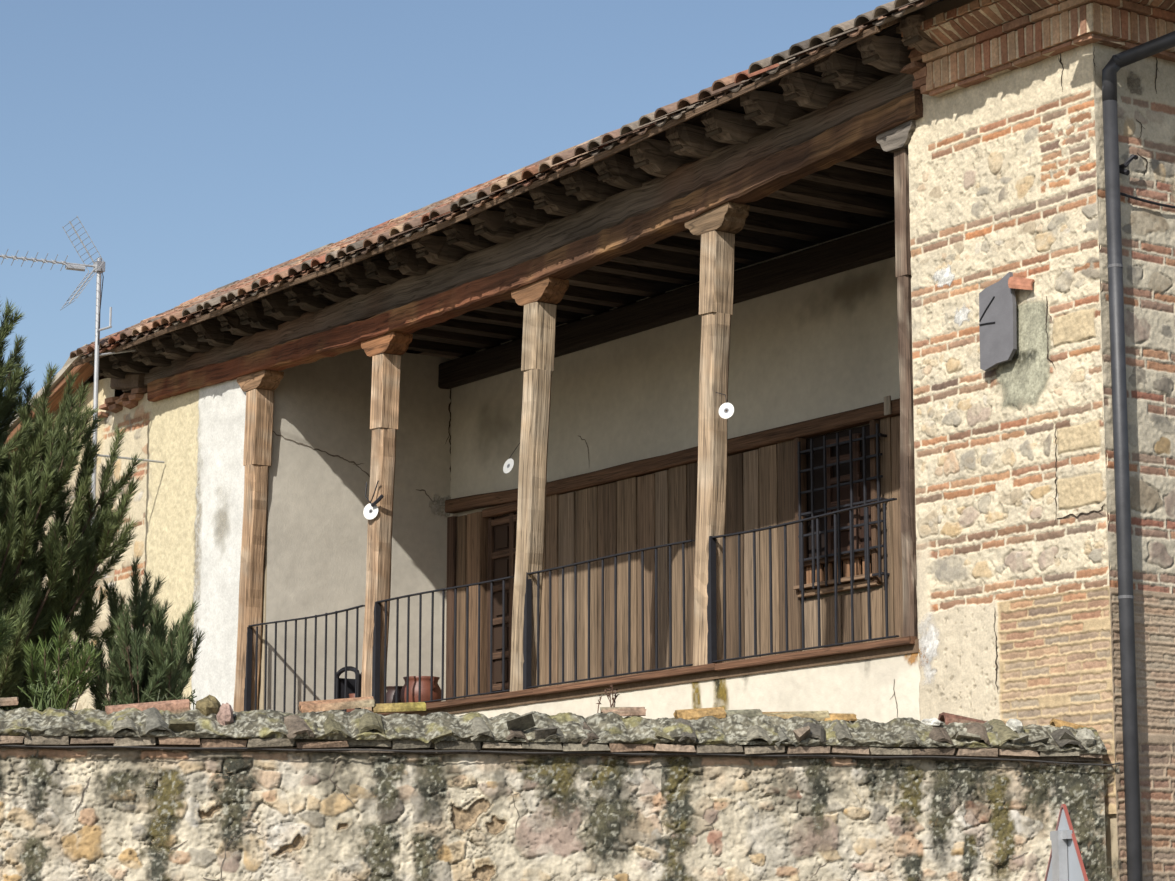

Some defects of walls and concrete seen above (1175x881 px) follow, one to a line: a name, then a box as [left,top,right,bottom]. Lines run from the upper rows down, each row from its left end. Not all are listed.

crack [273,431,370,478]
crack [1054,427,1105,524]
crack [992,614,1000,692]
leakage [19,837,51,881]
leakage [20,755,57,817]
leakage [99,770,185,881]
leakage [210,756,256,848]
leakage [358,823,440,881]
leakage [370,754,447,809]
leakage [511,756,635,863]
leakage [656,756,698,881]
leakage [852,759,1121,881]